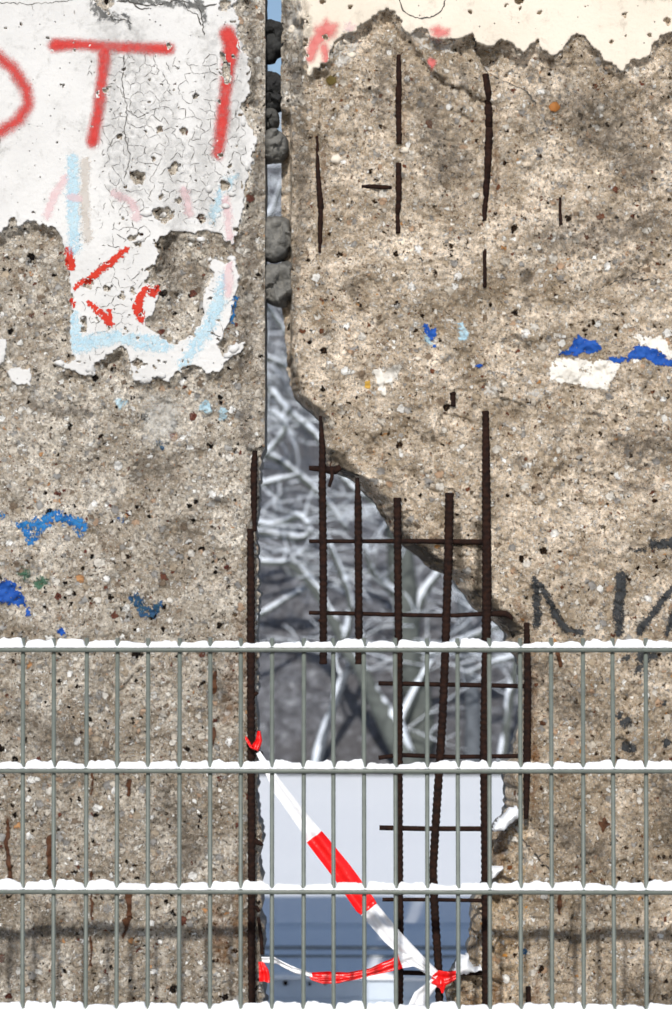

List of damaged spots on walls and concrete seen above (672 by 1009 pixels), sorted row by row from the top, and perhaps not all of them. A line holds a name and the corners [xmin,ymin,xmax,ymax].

spalling [0,0,266,1005]
crack [78,0,246,358]
spalling [280,0,672,1007]